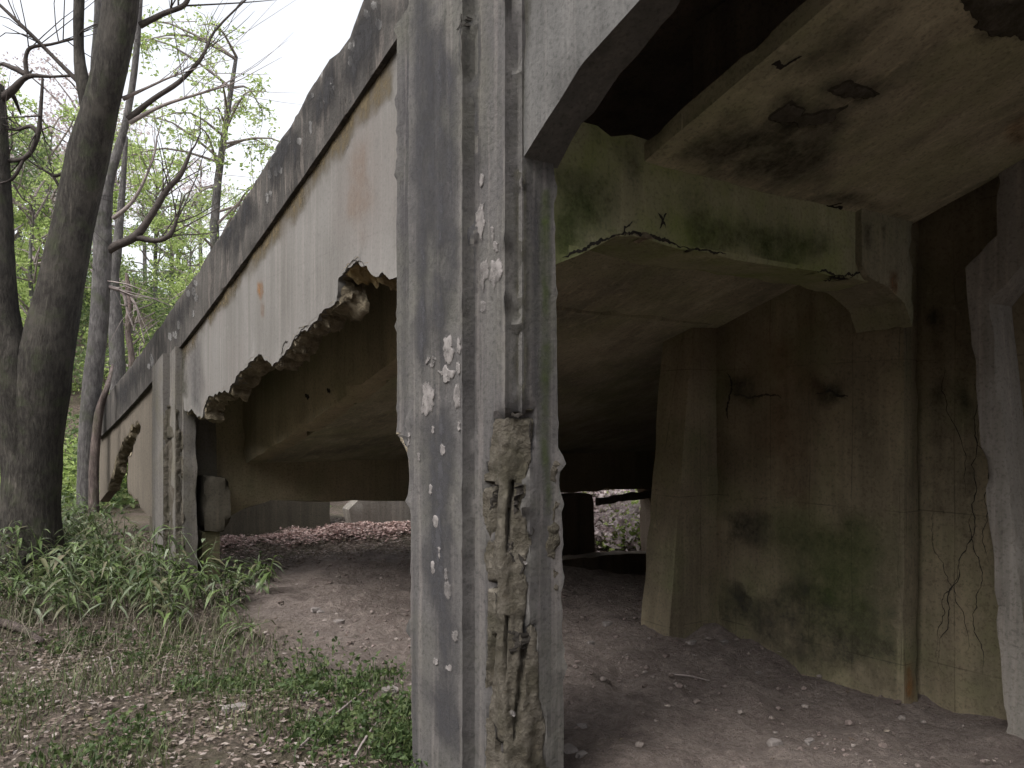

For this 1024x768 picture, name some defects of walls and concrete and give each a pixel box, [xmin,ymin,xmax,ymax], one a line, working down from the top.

peeling [768,80,880,130]
peeling [476,204,503,303]
crack [564,213,726,257]
crack [806,269,860,282]
spalling [163,256,397,573]
peeling [421,335,461,434]
spalling [107,420,147,514]
crack [931,368,989,671]
spalling [483,408,549,768]